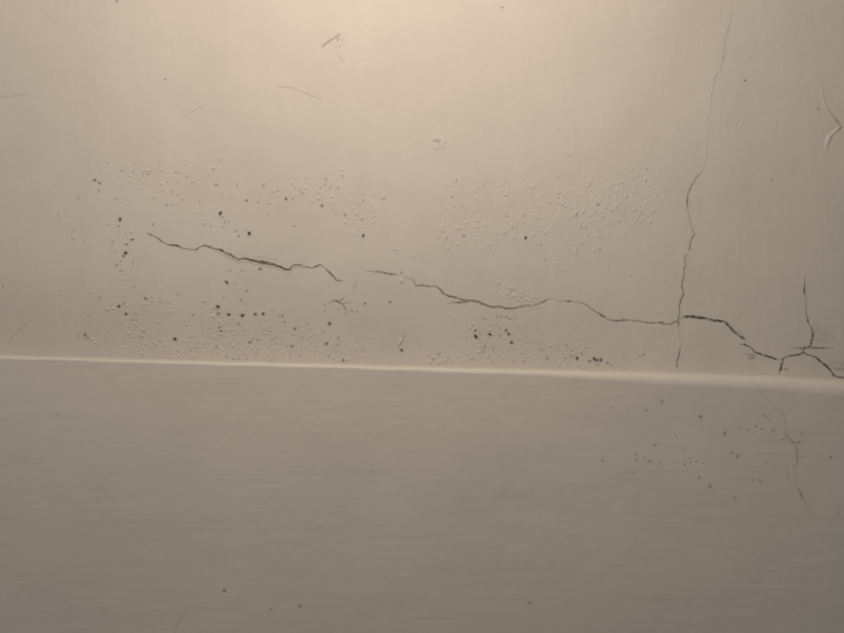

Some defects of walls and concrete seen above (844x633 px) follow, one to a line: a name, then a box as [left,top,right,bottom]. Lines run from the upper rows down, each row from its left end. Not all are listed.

water stain [215,289,310,357]
crack [147,0,844,379]